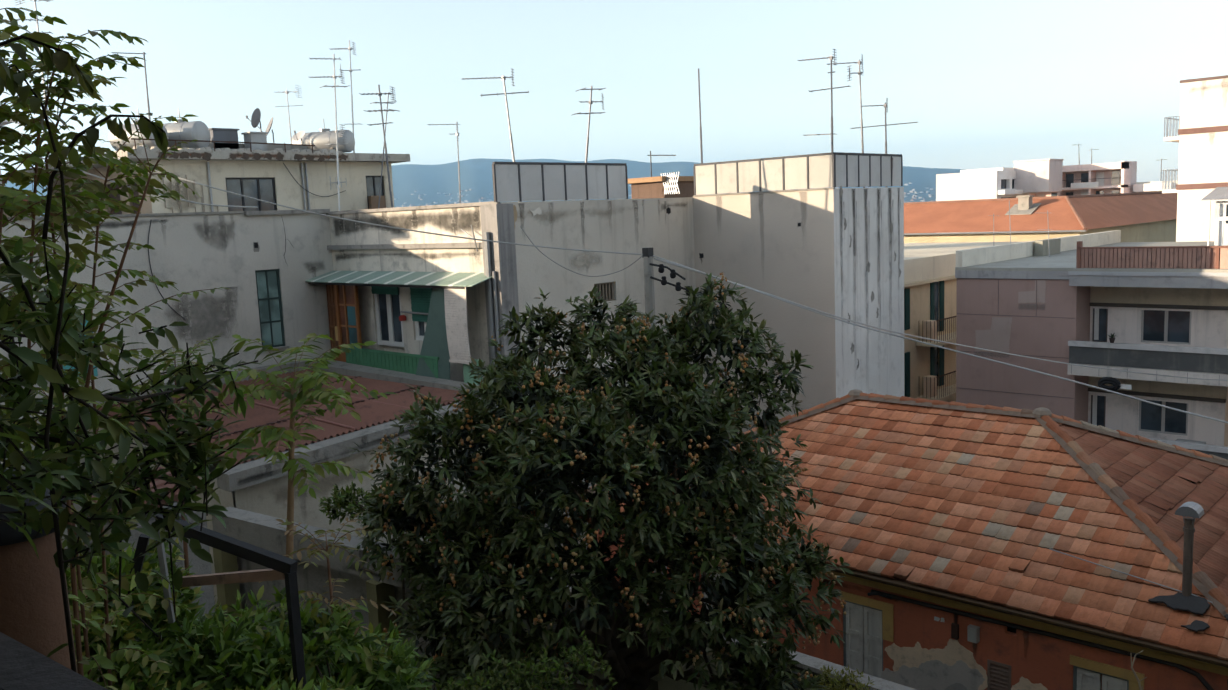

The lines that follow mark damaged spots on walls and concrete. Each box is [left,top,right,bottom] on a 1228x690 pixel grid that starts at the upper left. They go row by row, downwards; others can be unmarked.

flaking render [881,639,988,690]
flaking render [1011,677,1048,690]